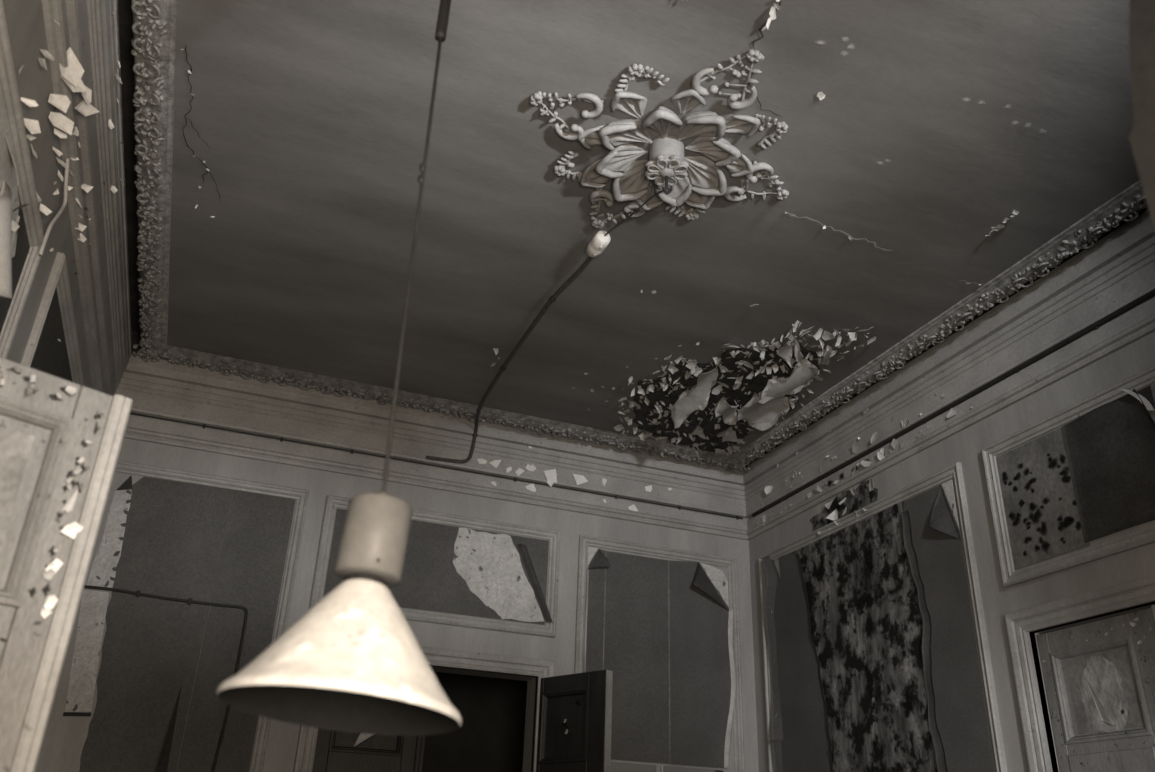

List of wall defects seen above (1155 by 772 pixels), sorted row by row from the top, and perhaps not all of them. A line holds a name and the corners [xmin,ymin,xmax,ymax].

peeling [21,48,124,245]
crack [786,212,892,251]
peeling [590,320,876,459]
peeling [28,410,104,619]
flaking render [453,528,544,622]
spalling [477,459,557,492]
peeling [756,471,800,525]
peeling [807,413,928,535]